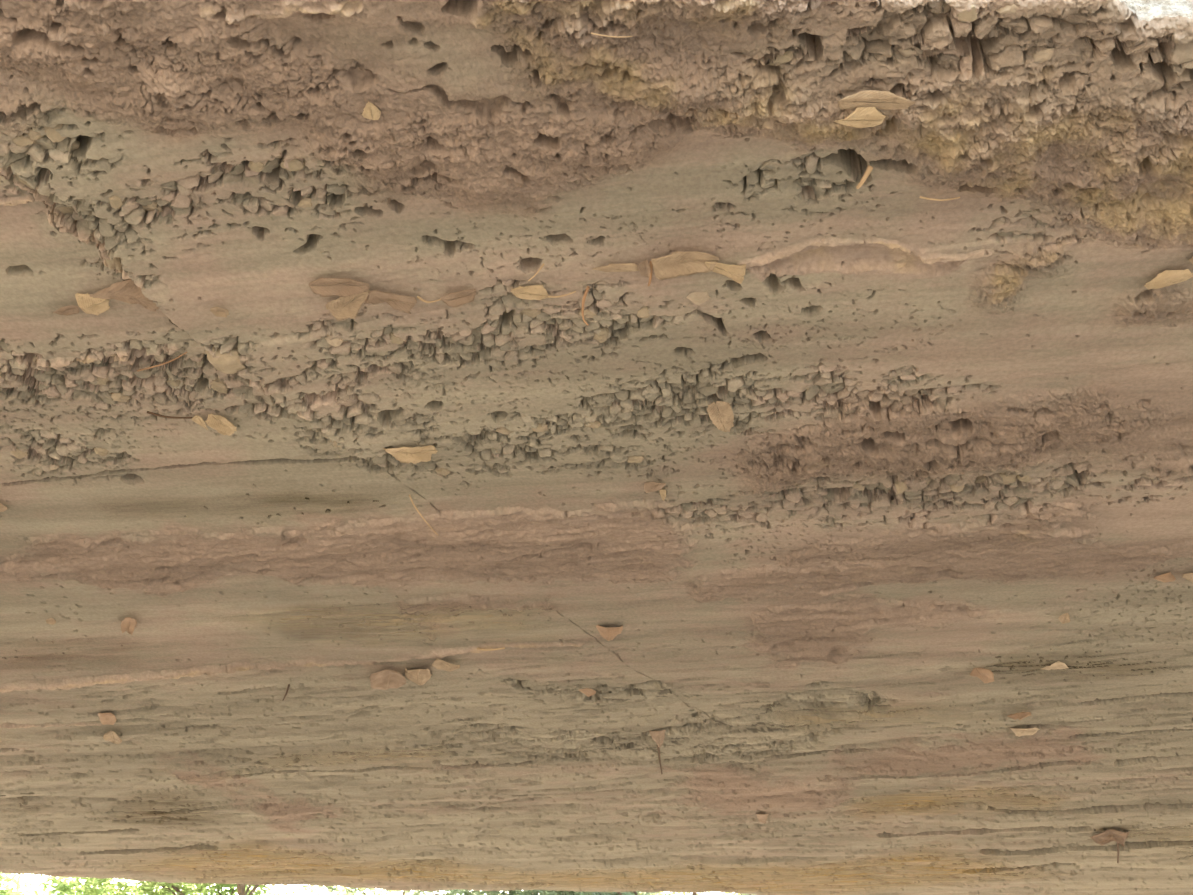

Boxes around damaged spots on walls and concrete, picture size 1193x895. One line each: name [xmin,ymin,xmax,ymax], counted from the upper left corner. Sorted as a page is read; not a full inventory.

spalling [392,186,963,425]